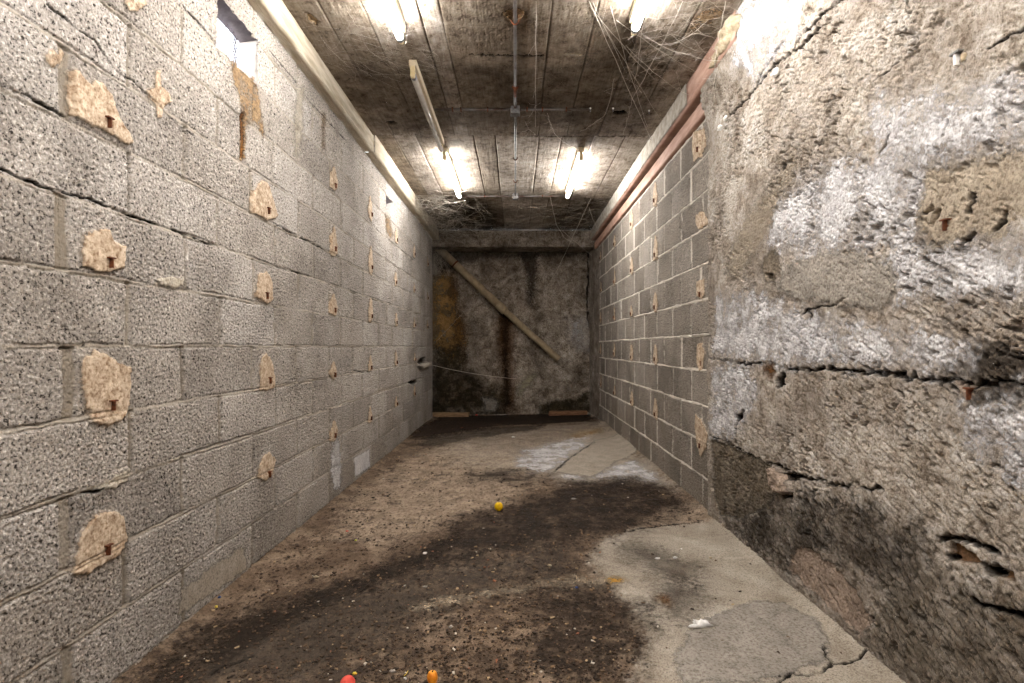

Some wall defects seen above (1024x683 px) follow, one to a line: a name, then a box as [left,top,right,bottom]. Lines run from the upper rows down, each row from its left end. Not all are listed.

crack [730,0,844,115]
corrosion [230,60,264,161]
crack [803,304,837,319]
damp [409,343,597,482]
crack [788,365,1024,389]
damp [155,461,699,683]
crack [779,648,867,683]
damp [741,495,953,683]
spalling [943,535,1016,581]
damp [955,591,1024,655]